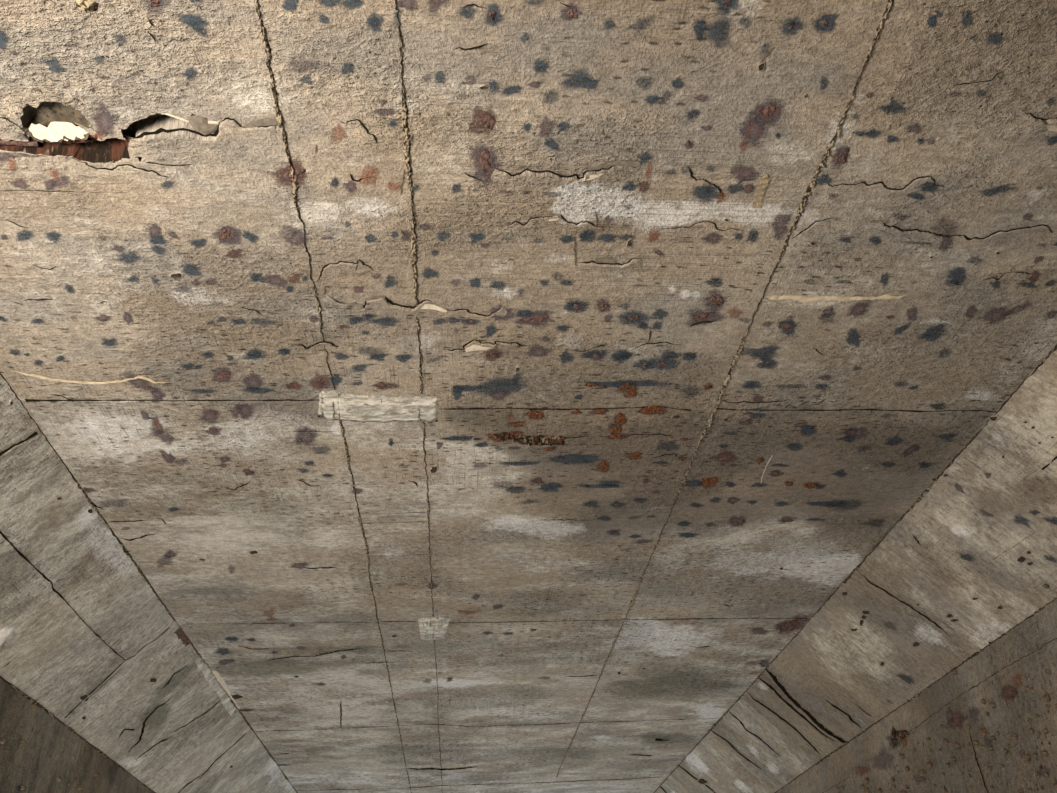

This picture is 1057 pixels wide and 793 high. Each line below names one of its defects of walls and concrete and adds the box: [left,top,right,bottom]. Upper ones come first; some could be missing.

spalling [0,90,219,169]
crack [1001,113,1057,151]
crack [461,161,644,279]
crack [660,167,757,241]
damp [693,184,743,202]
crack [792,176,1053,252]
crack [317,260,535,361]
corrosion [487,410,544,449]
corrosion [586,381,637,397]
corrosion [572,405,667,439]
crack [119,666,251,761]
crack [710,668,894,771]